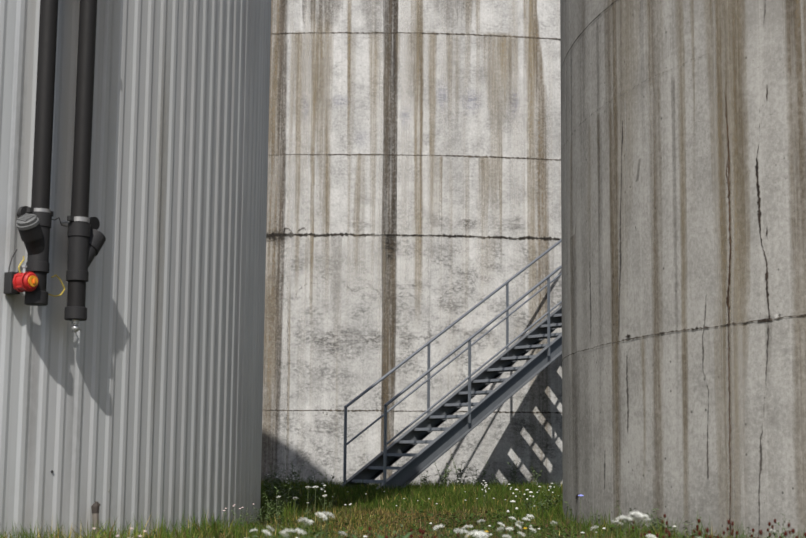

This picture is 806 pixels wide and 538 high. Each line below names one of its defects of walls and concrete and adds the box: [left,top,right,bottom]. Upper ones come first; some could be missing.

leakage [263,0,329,478]
leakage [371,0,435,451]
leakage [488,0,548,324]
leakage [609,21,619,473]
leakage [650,130,660,428]
crack [701,303,709,478]
leakage [710,0,745,331]
crack [724,95,732,535]
crack [756,430,764,532]
crack [755,146,770,376]
leakage [786,0,806,224]